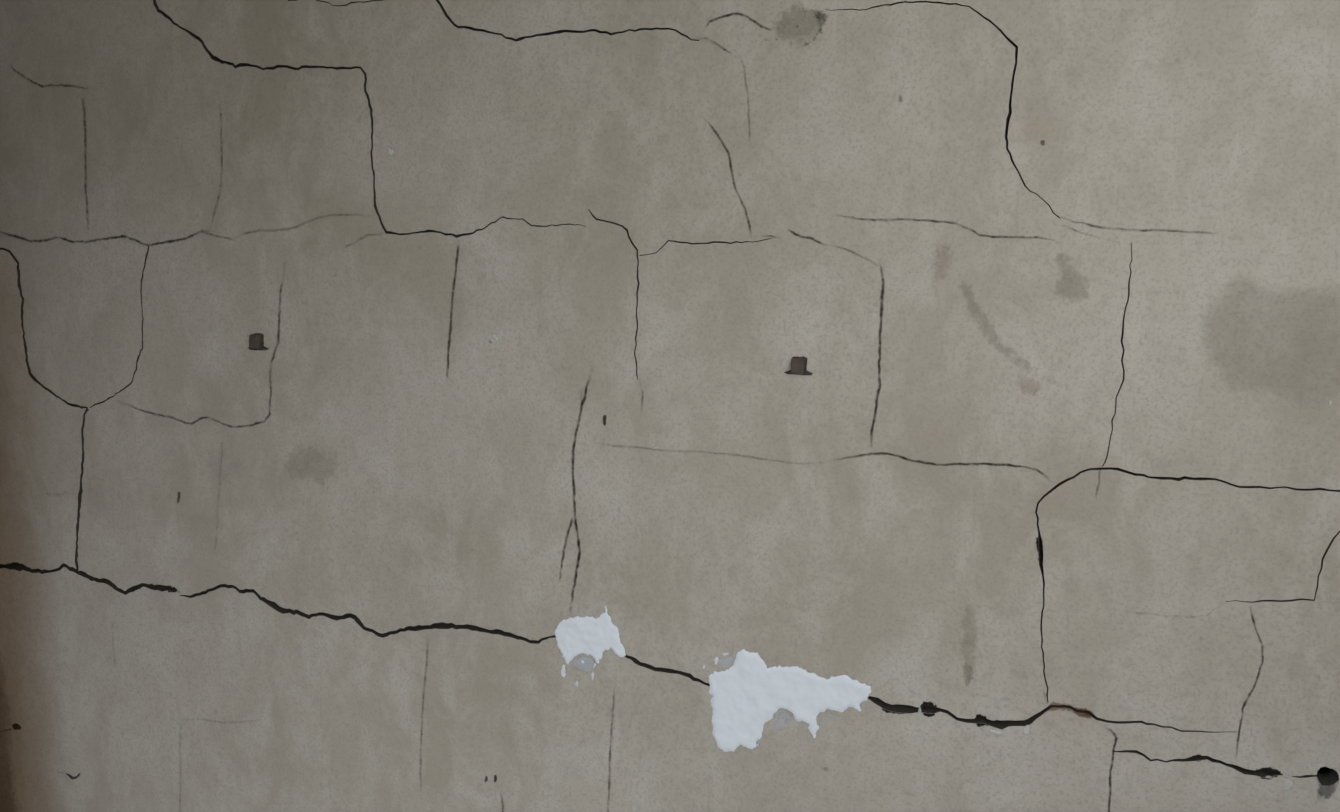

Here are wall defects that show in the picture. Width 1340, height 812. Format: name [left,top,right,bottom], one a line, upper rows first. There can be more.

crack [0,115,556,644]
crack [153,0,819,398]
crack [561,383,589,598]
crack [625,655,710,686]
crack [825,1,1101,238]
crack [849,230,1340,812]